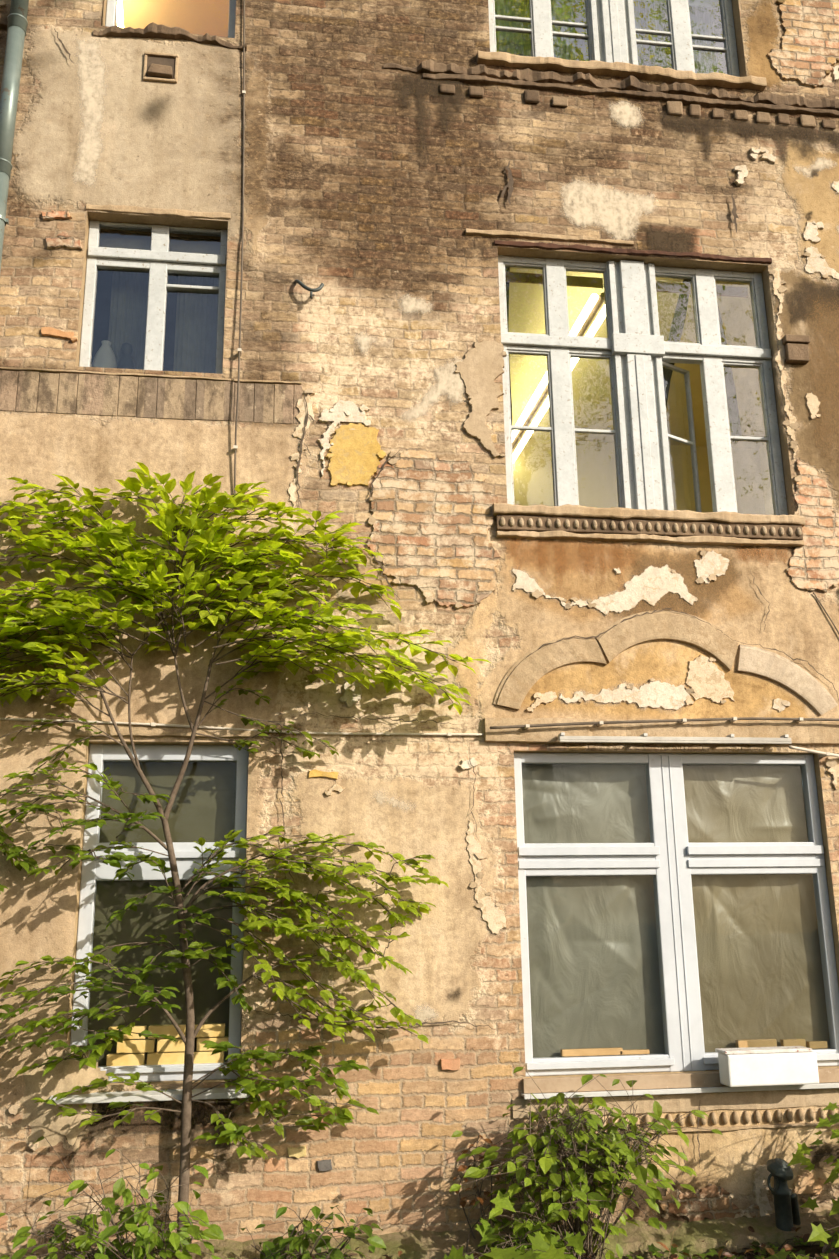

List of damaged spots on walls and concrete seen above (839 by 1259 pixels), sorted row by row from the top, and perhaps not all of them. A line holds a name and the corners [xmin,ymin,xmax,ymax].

spalling [767,0,839,88]
leakage [395,75,462,165]
peeling [733,146,776,186]
peeling [802,221,839,280]
leakage [786,279,839,461]
peeling [288,388,371,508]
spalling [767,267,839,594]
spalling [365,447,501,610]
peeling [511,550,730,615]
peeling [526,655,734,712]
crack [495,569,839,701]
peeling [465,820,506,934]